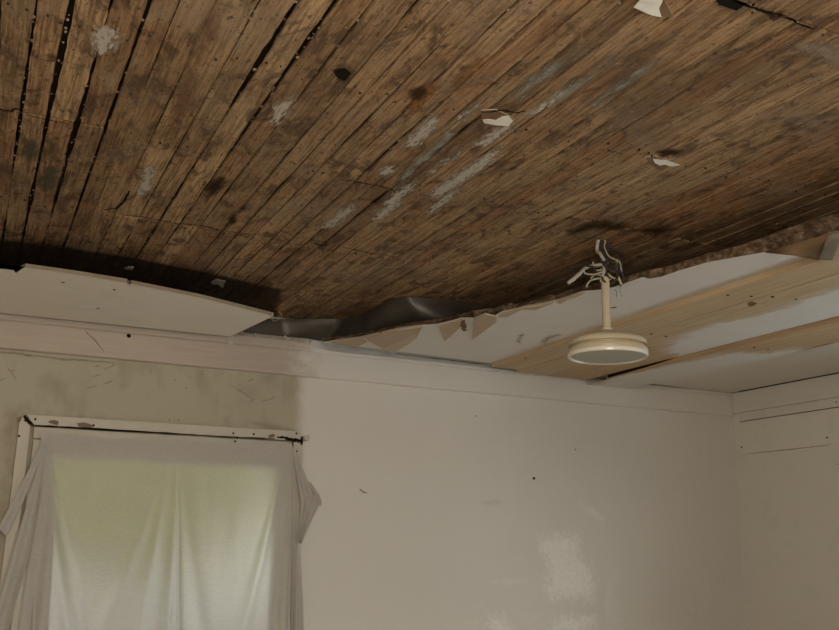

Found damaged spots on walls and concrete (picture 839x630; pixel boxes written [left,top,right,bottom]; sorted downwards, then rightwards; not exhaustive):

crack [716,0,839,66]
water stain [410,87,426,100]
spalling [322,213,839,342]